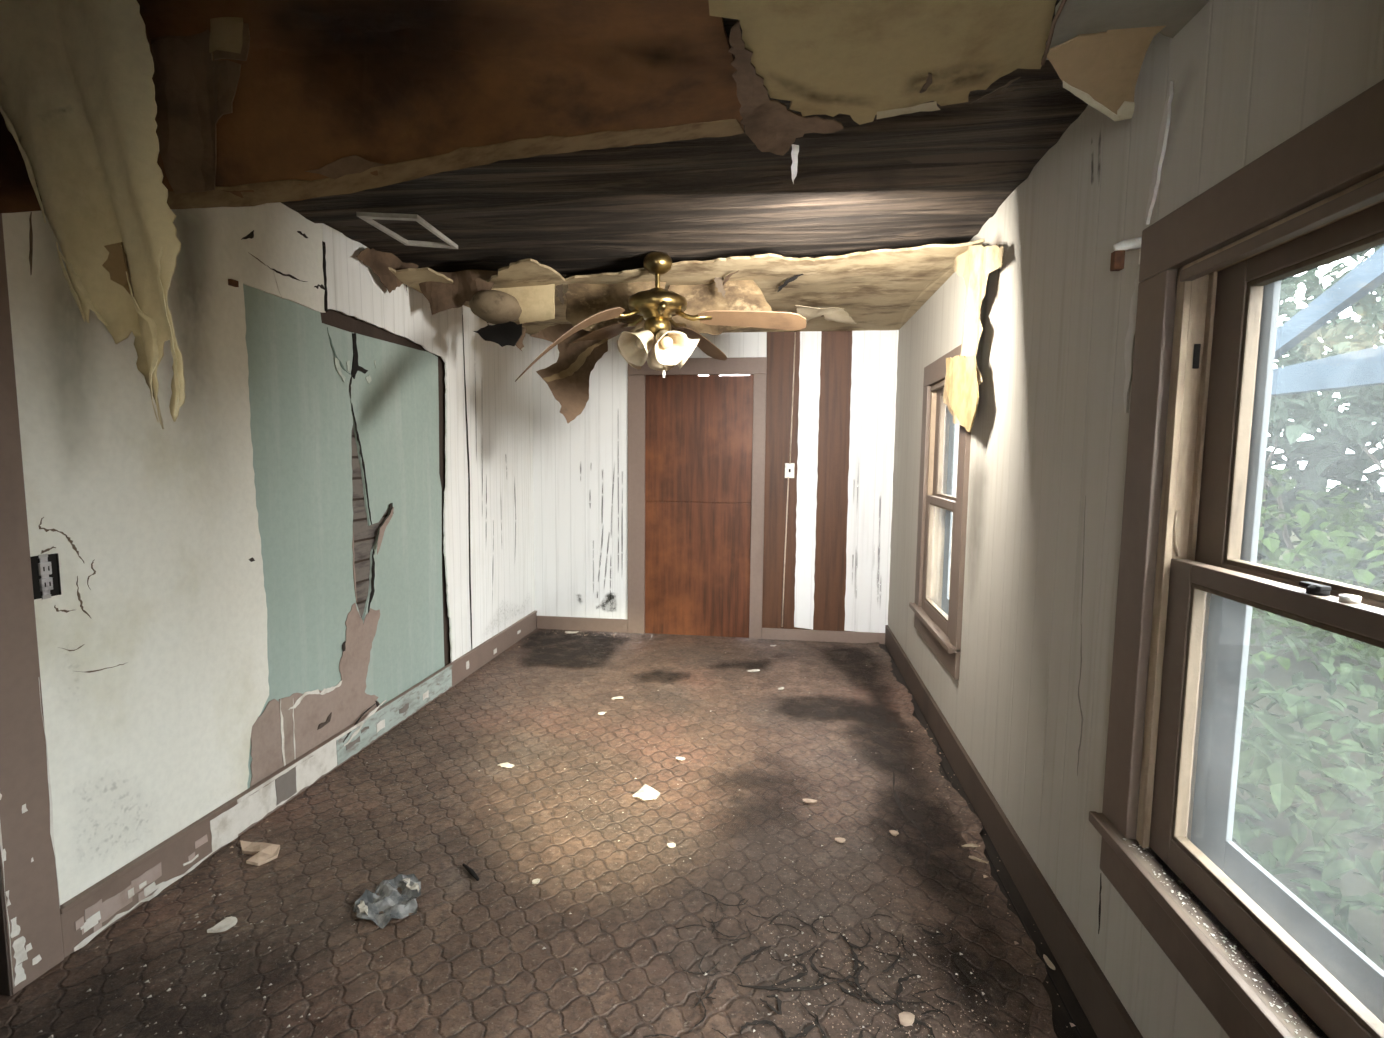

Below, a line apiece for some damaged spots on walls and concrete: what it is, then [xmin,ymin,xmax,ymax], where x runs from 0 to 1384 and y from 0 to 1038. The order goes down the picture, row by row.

peeling [795,305,858,324]
crack [39,517,125,673]
damp [522,629,628,668]
damp [642,670,687,682]
damp [718,661,768,669]
peeling [38,677,60,904]
peeling [73,603,469,952]
damp [780,648,992,941]
peeling [0,824,42,986]
damp [59,975,267,1038]
crack [643,892,957,1038]
damp [933,937,988,1015]